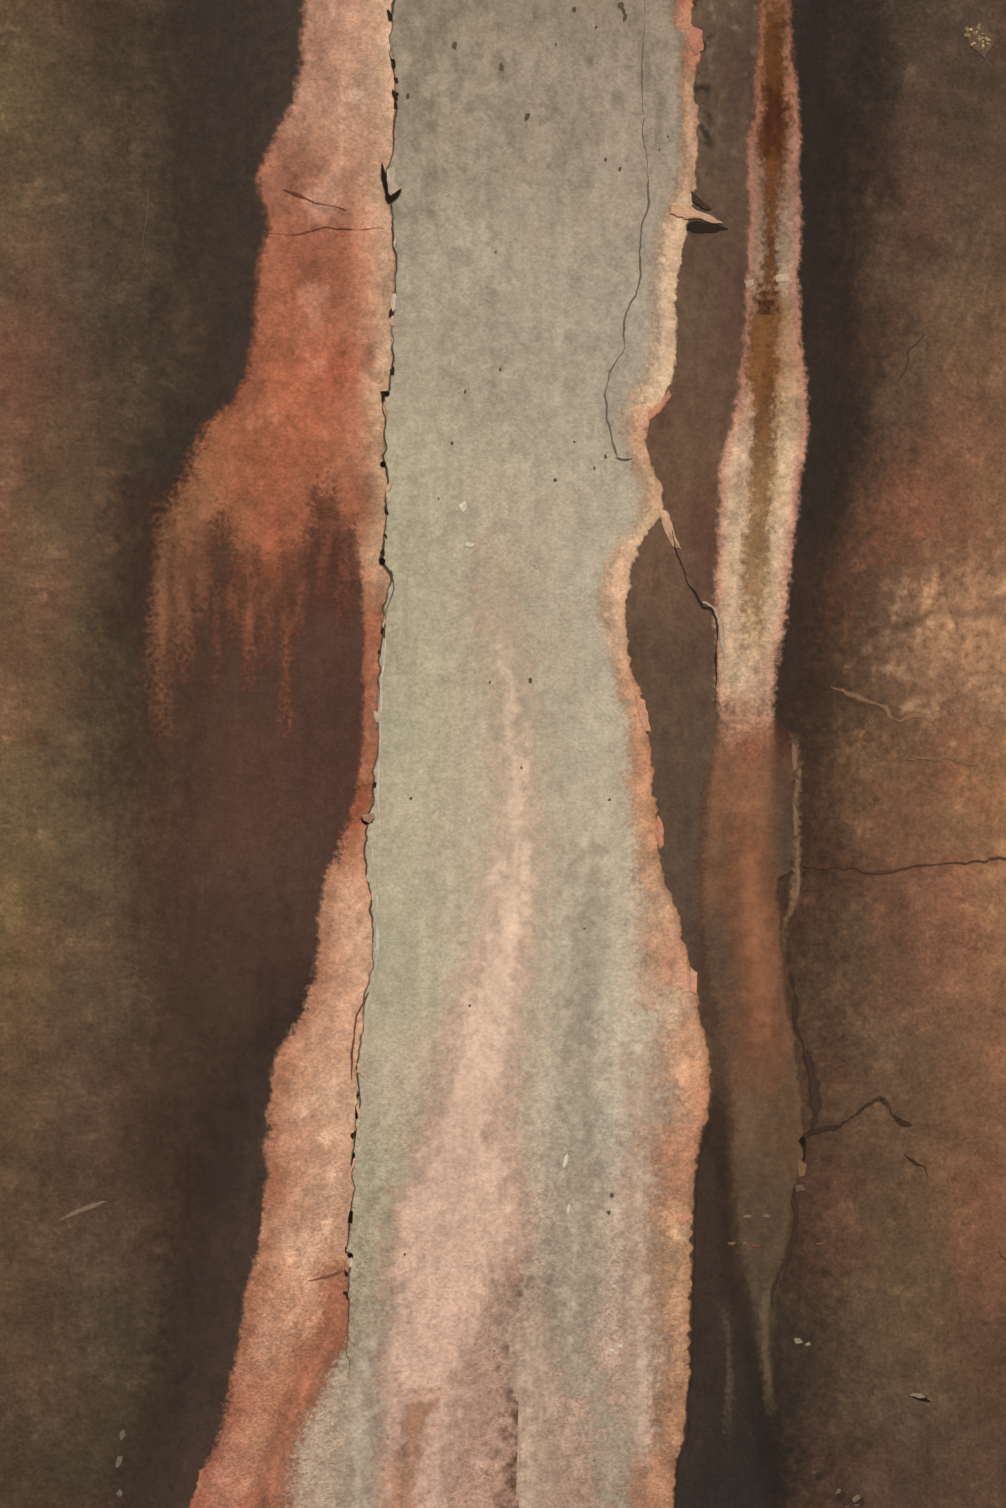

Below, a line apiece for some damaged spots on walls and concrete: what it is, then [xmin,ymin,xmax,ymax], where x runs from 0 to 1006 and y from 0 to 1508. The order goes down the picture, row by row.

crack [604,17,650,461]
rust [713,0,809,765]
rust [145,0,396,1508]
peeling [264,0,728,1508]
crack [668,530,725,699]
crack [802,856,1006,874]
crack [770,922,928,1310]